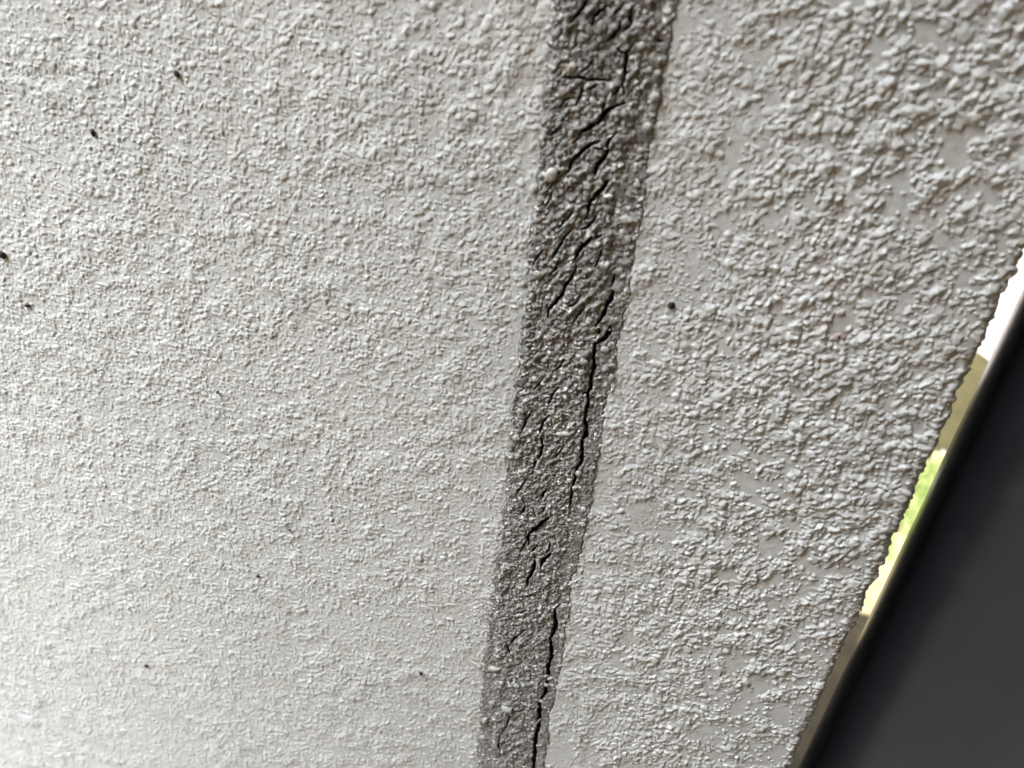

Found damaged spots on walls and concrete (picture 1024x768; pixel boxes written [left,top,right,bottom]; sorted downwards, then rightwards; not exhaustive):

crack [498,0,663,768]